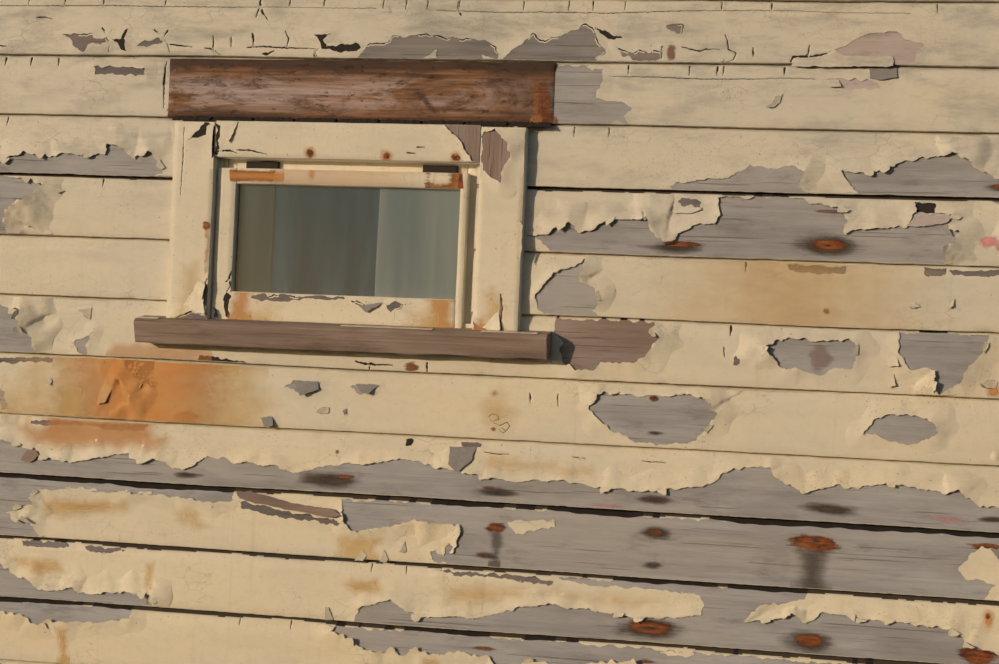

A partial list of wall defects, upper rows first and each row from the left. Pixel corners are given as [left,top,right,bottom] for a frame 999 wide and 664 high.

peeling [53,22,169,89]
peeling [791,22,935,102]
rust [655,241,698,252]
rust [799,237,854,255]
rust [423,299,452,328]
rust [39,357,220,443]
peeling [0,135,999,664]
rust [790,535,840,589]
rust [620,620,675,638]
rust [791,633,830,652]
rust [959,648,995,664]